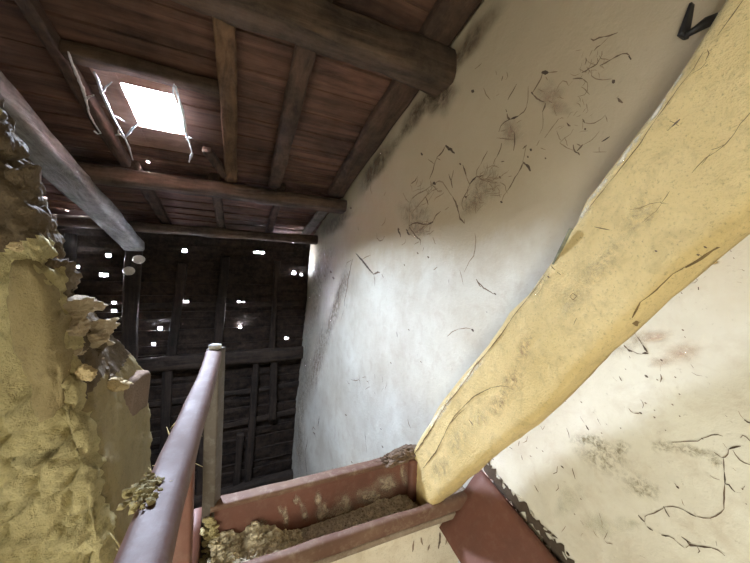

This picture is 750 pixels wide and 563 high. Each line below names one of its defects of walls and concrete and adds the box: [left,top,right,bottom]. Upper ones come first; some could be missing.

crack [321,32,631,339]
crack [408,278,543,468]
crack [619,246,744,417]
spalling [484,462,575,563]
crack [629,402,750,556]